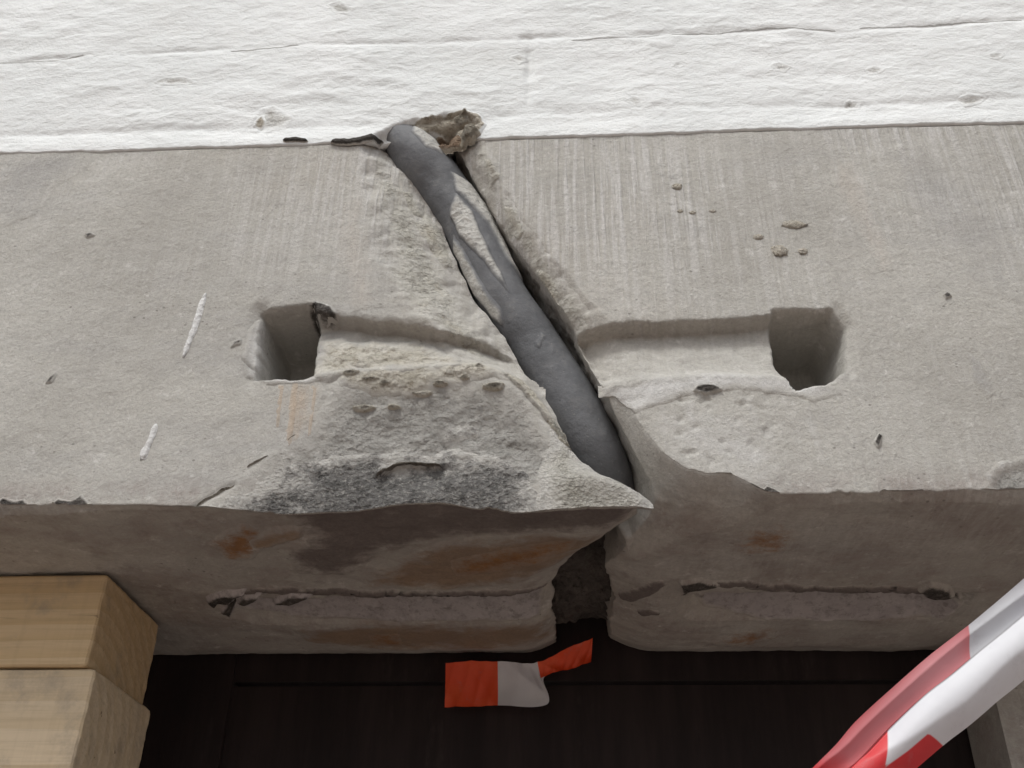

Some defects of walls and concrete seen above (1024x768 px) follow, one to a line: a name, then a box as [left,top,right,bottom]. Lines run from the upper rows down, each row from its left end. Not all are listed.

spalling [406,108,600,349]
spalling [176,145,572,515]
corrosion [208,524,305,561]
water stain [284,504,634,591]
crack [244,582,548,599]
crack [618,580,667,616]
crack [717,579,921,595]